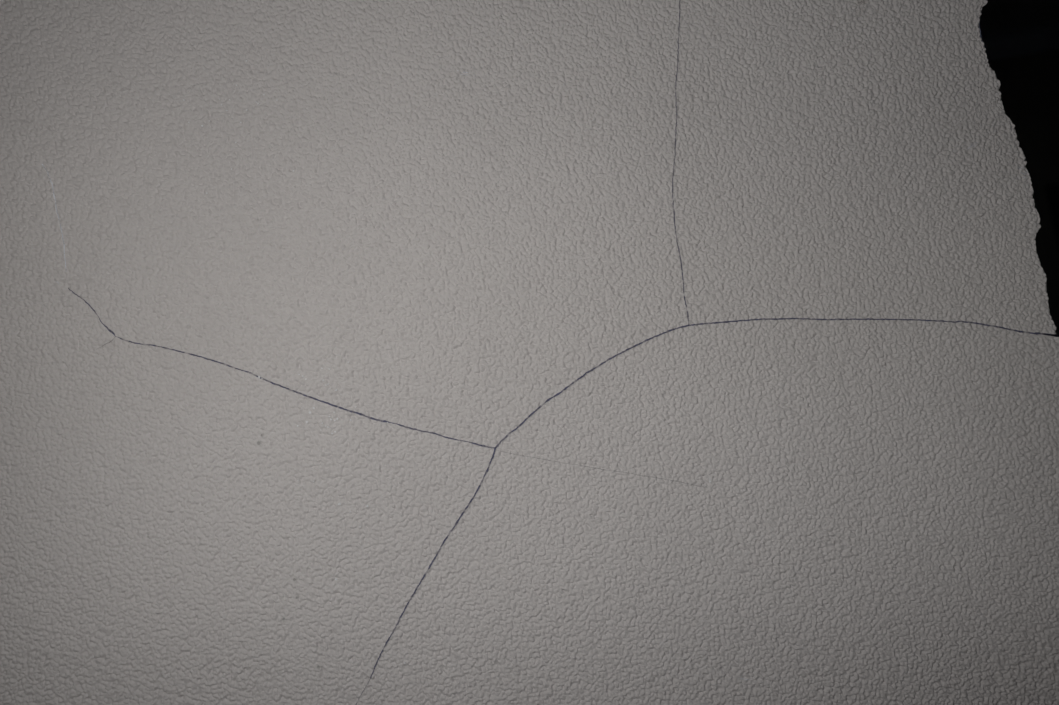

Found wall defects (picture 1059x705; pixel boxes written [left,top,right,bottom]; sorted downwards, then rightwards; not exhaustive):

crack [673,1,681,96]
crack [68,105,1059,704]